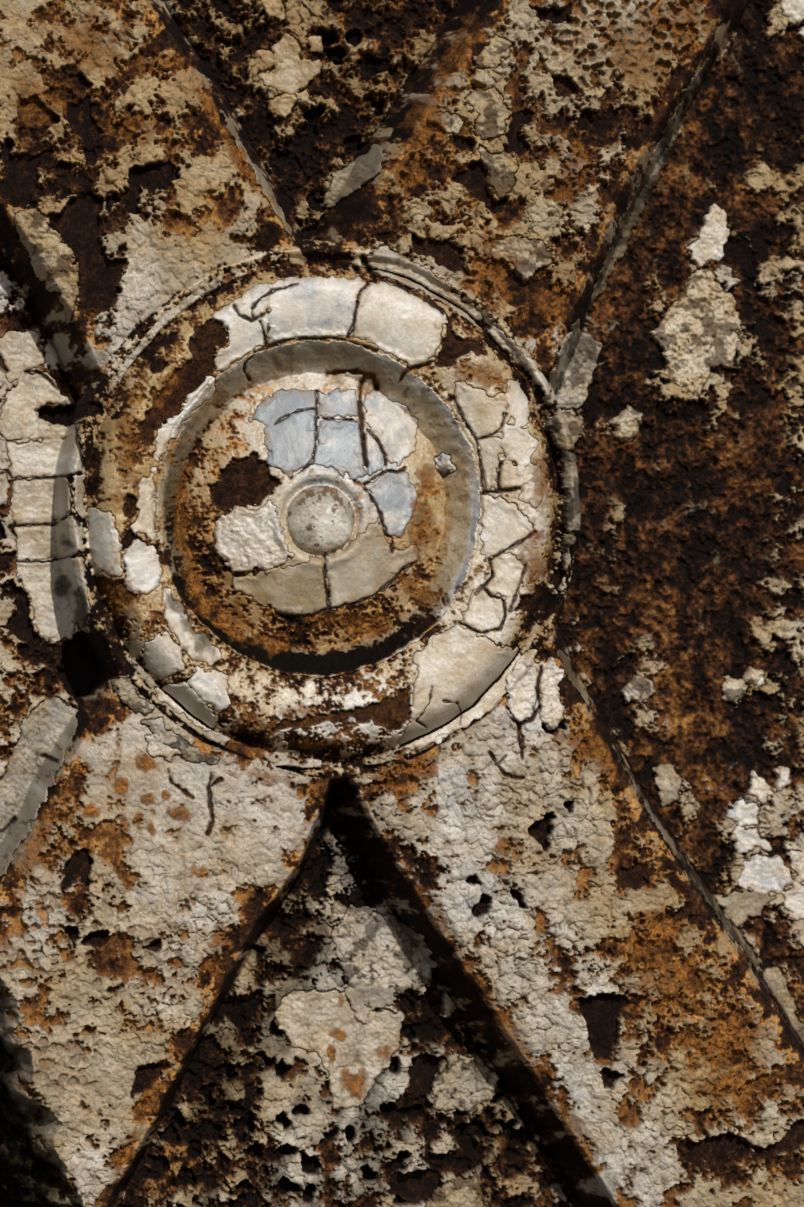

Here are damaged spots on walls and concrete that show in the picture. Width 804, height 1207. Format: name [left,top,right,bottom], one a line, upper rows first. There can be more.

corrosion [199,92,259,185]
peeling [650,204,742,402]
corrosion [175,465,289,654]
crack [236,261,438,617]
peeling [0,58,710,877]
crack [455,401,517,494]
crack [463,533,533,633]
crack [491,672,541,778]
peeling [612,743,804,1049]
corrosion [327,1029,367,1099]
peeling [274,905,438,1109]
corrosion [618,909,788,1112]